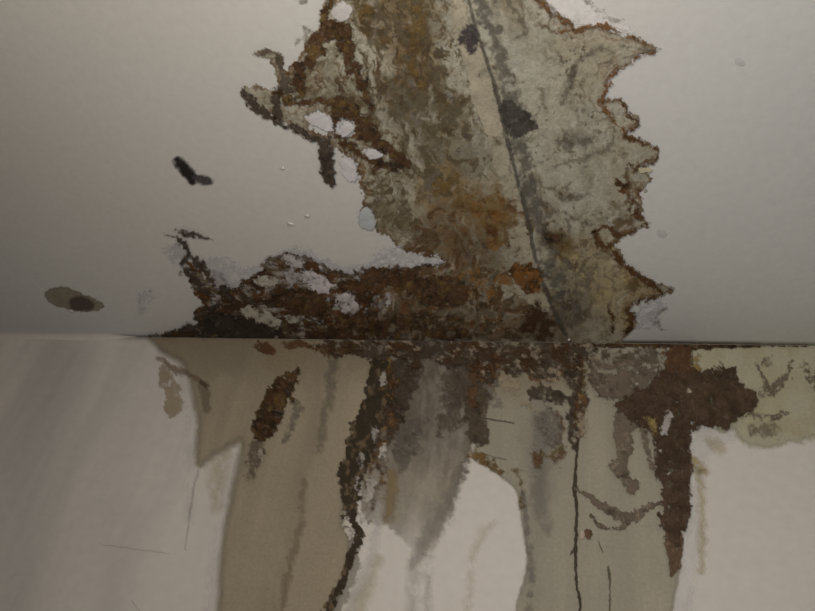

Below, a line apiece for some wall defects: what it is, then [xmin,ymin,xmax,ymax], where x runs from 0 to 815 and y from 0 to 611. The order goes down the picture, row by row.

flaking render [208,0,673,343]
water stain [45,287,104,312]
rust [148,229,442,340]
rust [245,367,300,476]
water stain [149,337,815,611]
crack [570,373,582,611]
crack [600,547,611,611]